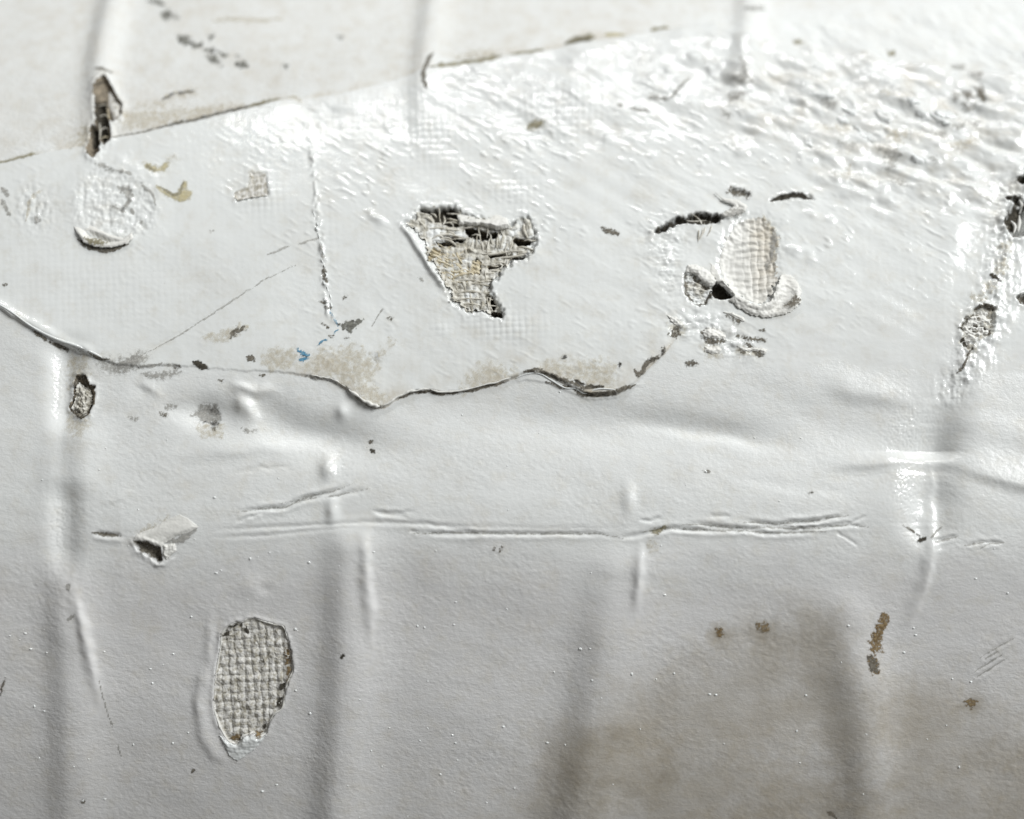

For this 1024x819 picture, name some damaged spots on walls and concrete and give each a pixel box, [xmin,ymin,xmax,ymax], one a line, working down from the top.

spalling [409,217,500,247]
spalling [475,218,534,289]
spalling [684,264,716,306]
spalling [957,303,994,373]
peeling [163,543,177,560]
crack [414,530,616,538]
crack [644,516,863,535]
rust [867,612,890,676]
peeling [213,618,294,761]